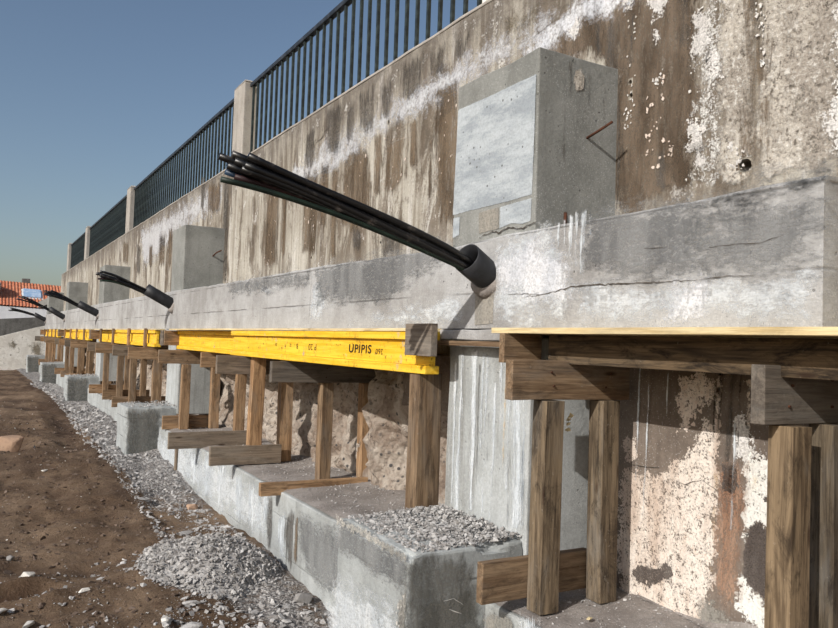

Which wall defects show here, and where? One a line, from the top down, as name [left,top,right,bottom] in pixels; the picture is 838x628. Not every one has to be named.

water stain [123,178,440,317]
water stain [293,0,832,327]
crack [509,275,754,297]
peeling [617,372,729,624]
corrosion [714,464,743,601]
peeling [732,379,768,628]